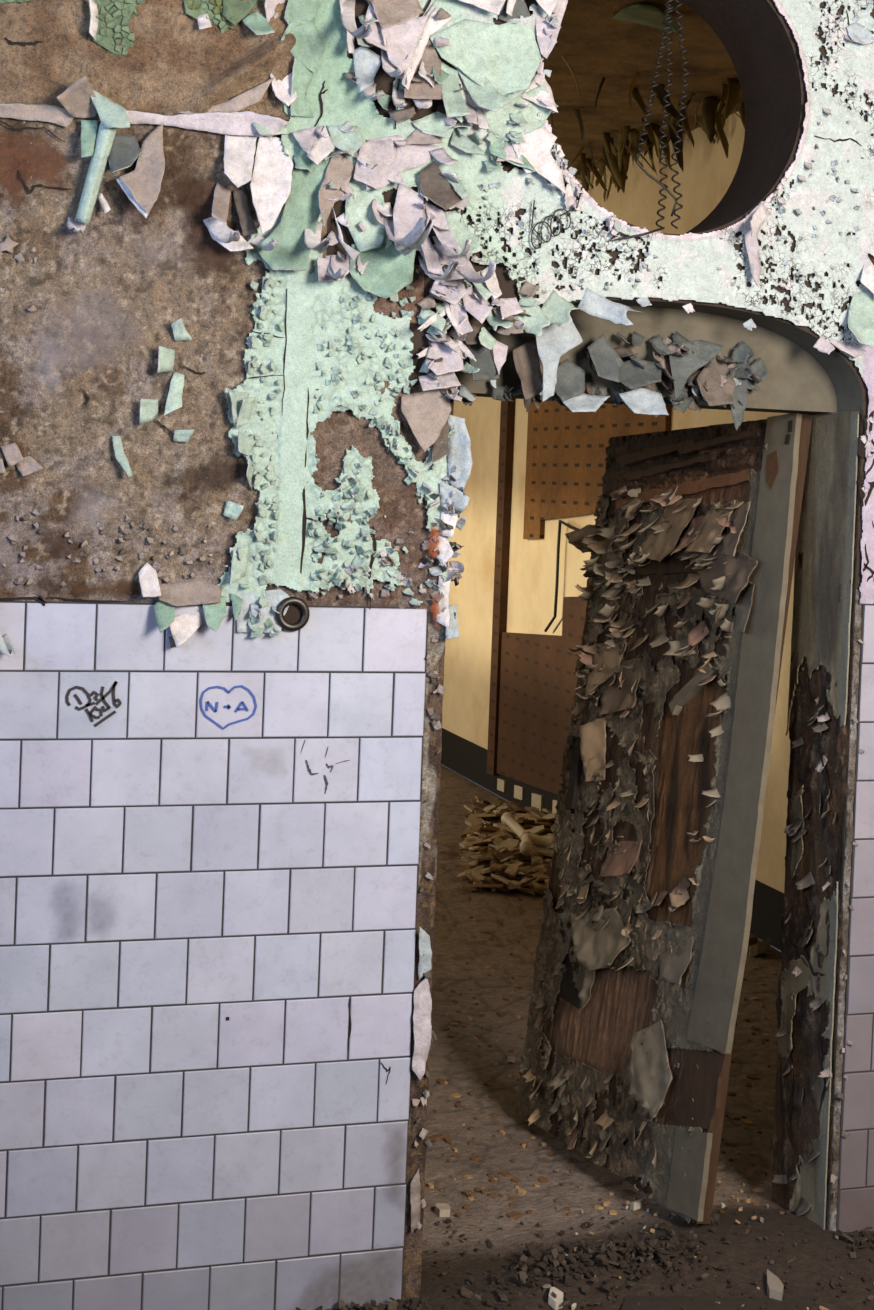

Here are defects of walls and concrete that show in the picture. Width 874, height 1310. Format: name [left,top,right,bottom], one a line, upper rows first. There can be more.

flaking render [847,0,874,34]
peeling [695,78,745,158]
peeling [719,143,874,287]
peeling [813,256,874,358]
peeling [584,331,768,430]
crack [858,407,874,582]
flaking render [0,0,697,1300]
peeling [770,410,874,1231]